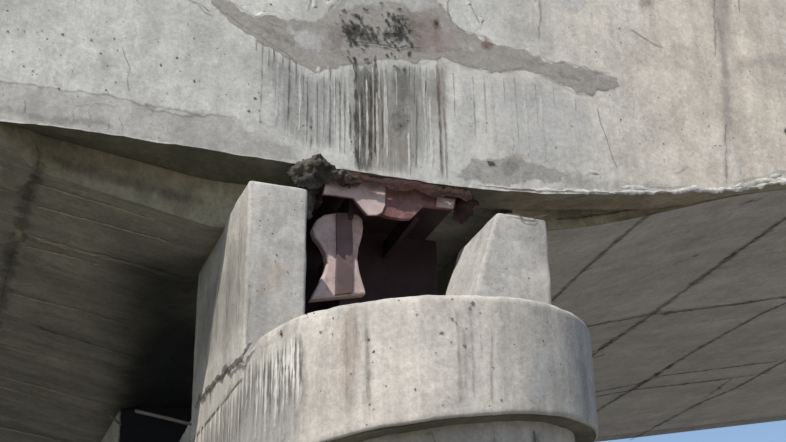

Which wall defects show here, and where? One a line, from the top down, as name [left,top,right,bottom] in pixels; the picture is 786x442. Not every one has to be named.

leakage [288,78,318,128]
leakage [327,2,419,168]
spalling [211,0,619,96]
leakage [407,78,433,166]
spalling [287,154,786,225]
crack [508,209,639,221]